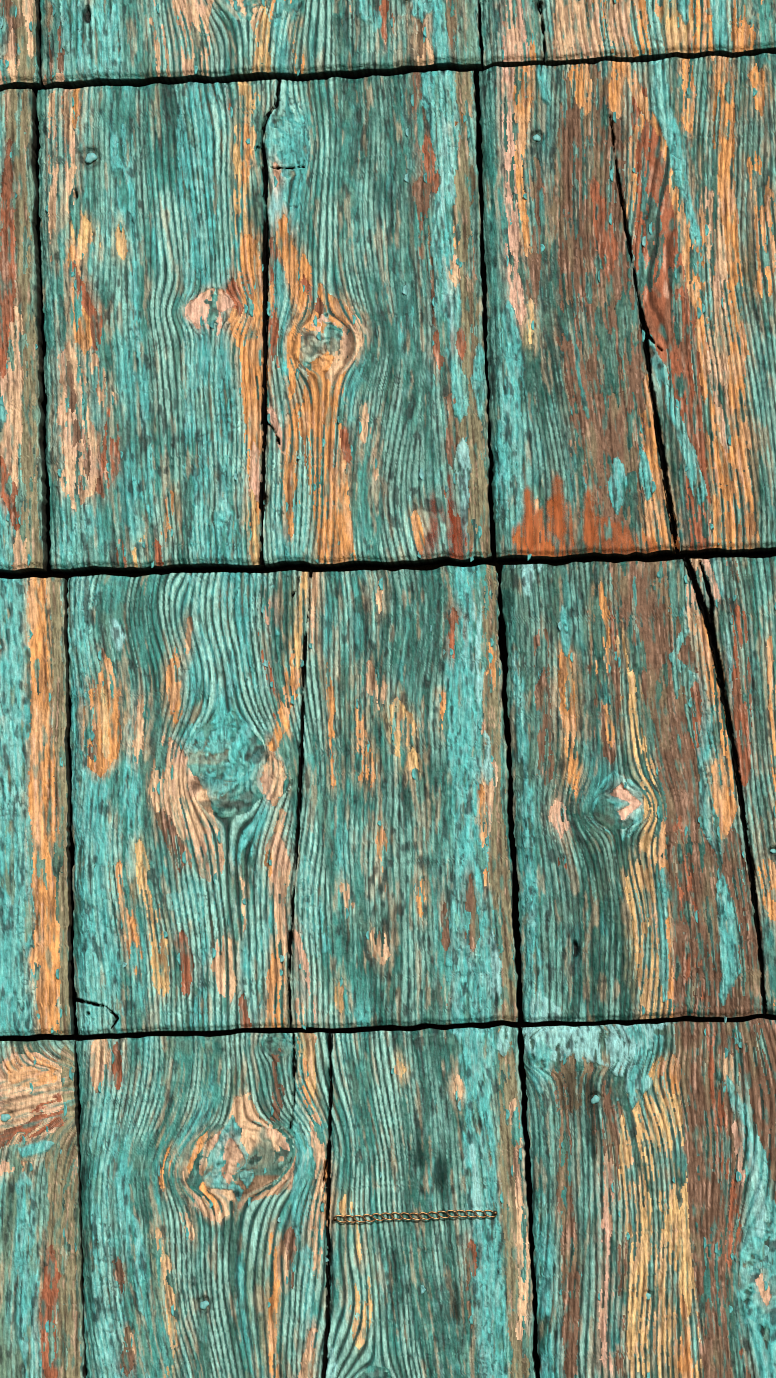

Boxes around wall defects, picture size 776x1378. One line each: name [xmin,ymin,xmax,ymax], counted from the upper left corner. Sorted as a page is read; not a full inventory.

crack [532,0,545,65]
crack [255,80,305,565]
peeling [0,0,225,1378]
peeling [149,0,373,1378]
crack [287,570,332,1378]
peeling [366,927,391,965]
peeling [375,821,388,892]
peeling [354,660,419,788]
peeling [391,1059,407,1077]
peeling [501,0,776,1378]
crack [609,117,767,1019]